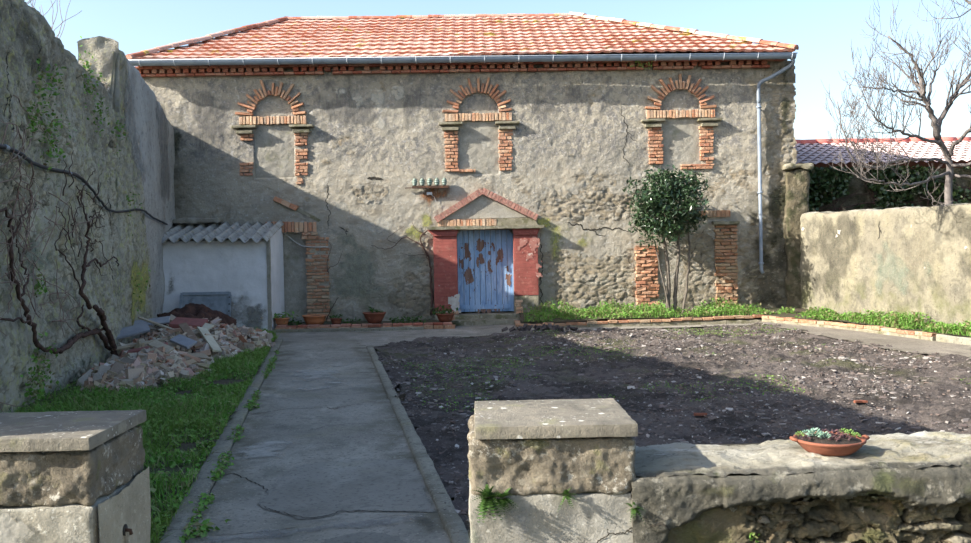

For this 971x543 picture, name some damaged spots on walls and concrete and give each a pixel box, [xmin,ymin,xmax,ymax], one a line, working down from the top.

crack [621,110,637,170]
crack [565,200,631,236]
crack [536,234,544,303]
crack [580,494,671,543]